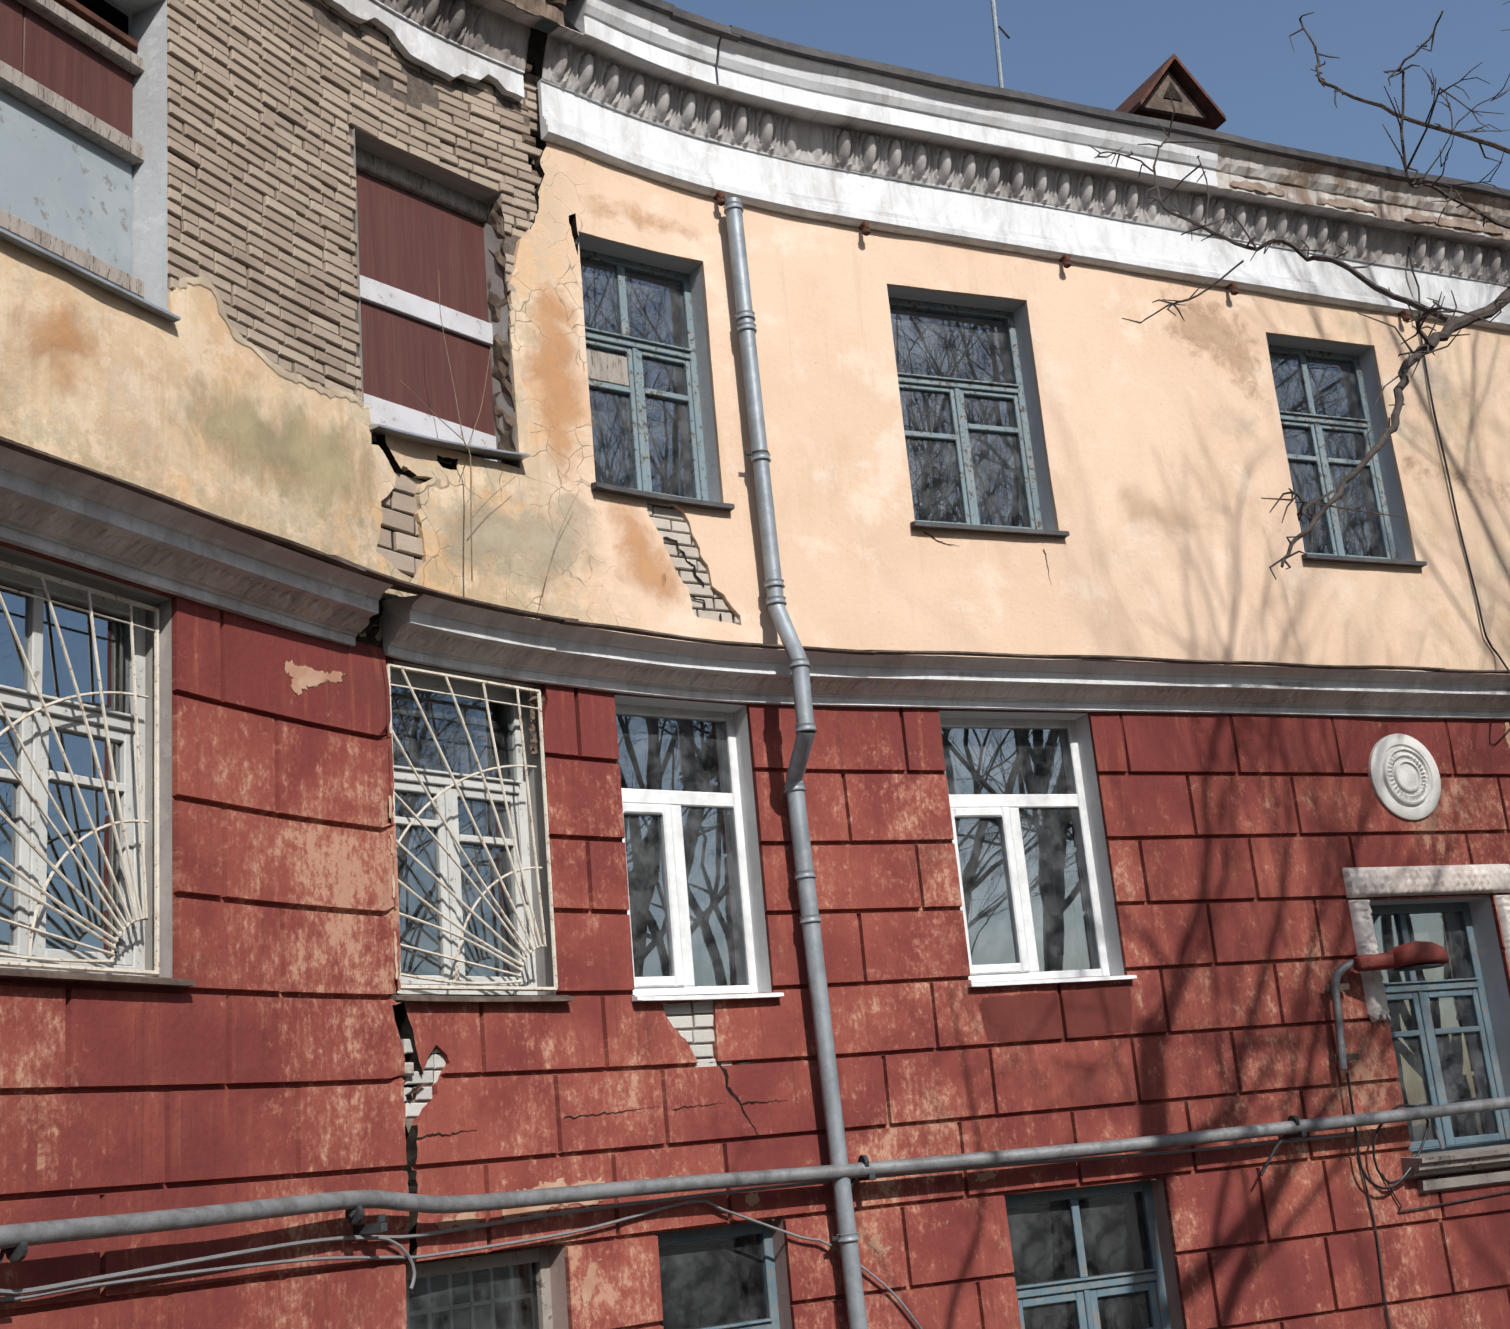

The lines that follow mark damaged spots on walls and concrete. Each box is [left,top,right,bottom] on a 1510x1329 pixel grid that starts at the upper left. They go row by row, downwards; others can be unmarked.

crack [516,60,540,204]
flaking render [165,0,543,464]
peeling [1405,214,1504,234]
flaking render [376,469,427,578]
flaking render [647,500,739,624]
flaking render [663,1000,752,1067]
crack [401,1062,414,1088]
crack [405,1128,476,1139]
crack [563,1061,786,1134]